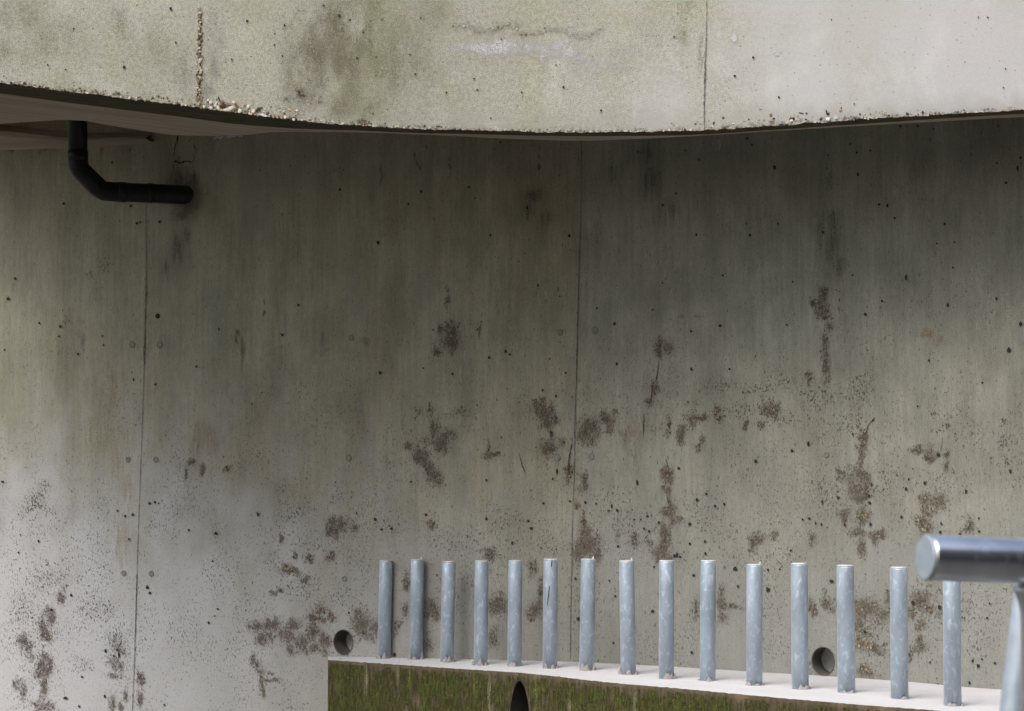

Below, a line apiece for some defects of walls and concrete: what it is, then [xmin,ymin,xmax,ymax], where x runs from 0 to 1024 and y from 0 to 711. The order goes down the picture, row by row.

leakage [453,38,586,61]
spalling [1,77,1020,132]